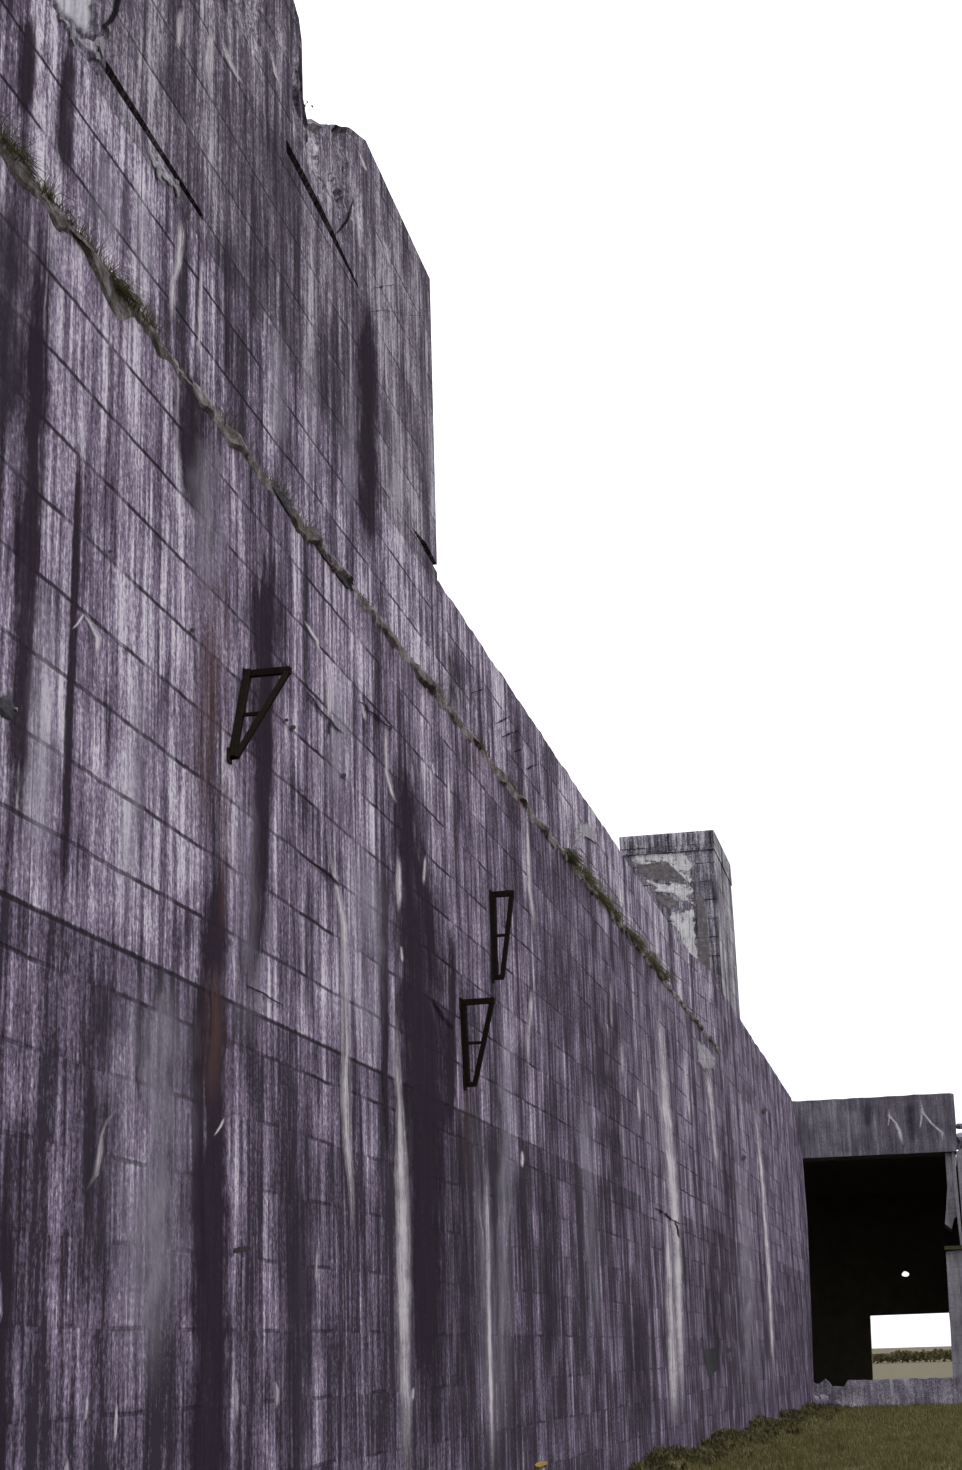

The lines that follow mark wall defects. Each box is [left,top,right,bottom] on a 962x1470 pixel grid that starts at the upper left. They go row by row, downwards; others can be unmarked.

leakage [19,18,37,112]
leakage [56,44,75,167]
peeling [56,0,105,60]
leakage [0,217,51,811]
leakage [62,457,101,876]
leakage [174,271,210,529]
leakage [188,858,238,1470]
leakage [248,547,279,987]
leakage [349,304,379,541]
leakage [365,737,468,1419]
spalling [632,853,698,959]
leakage [659,1027,683,1401]